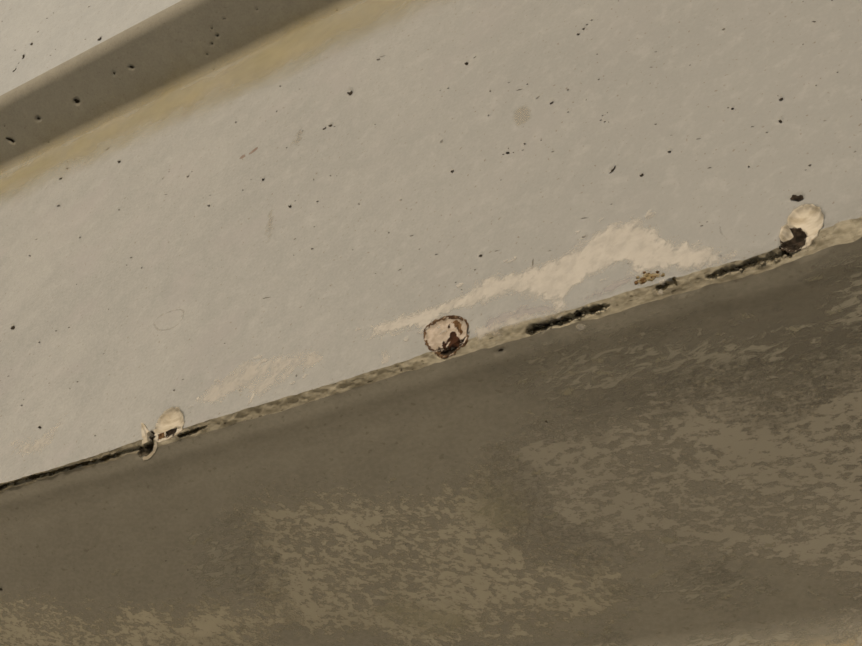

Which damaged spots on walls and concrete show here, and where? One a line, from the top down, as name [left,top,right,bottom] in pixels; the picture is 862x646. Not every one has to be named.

peeling [0,204,862,646]
leakage [372,211,719,341]